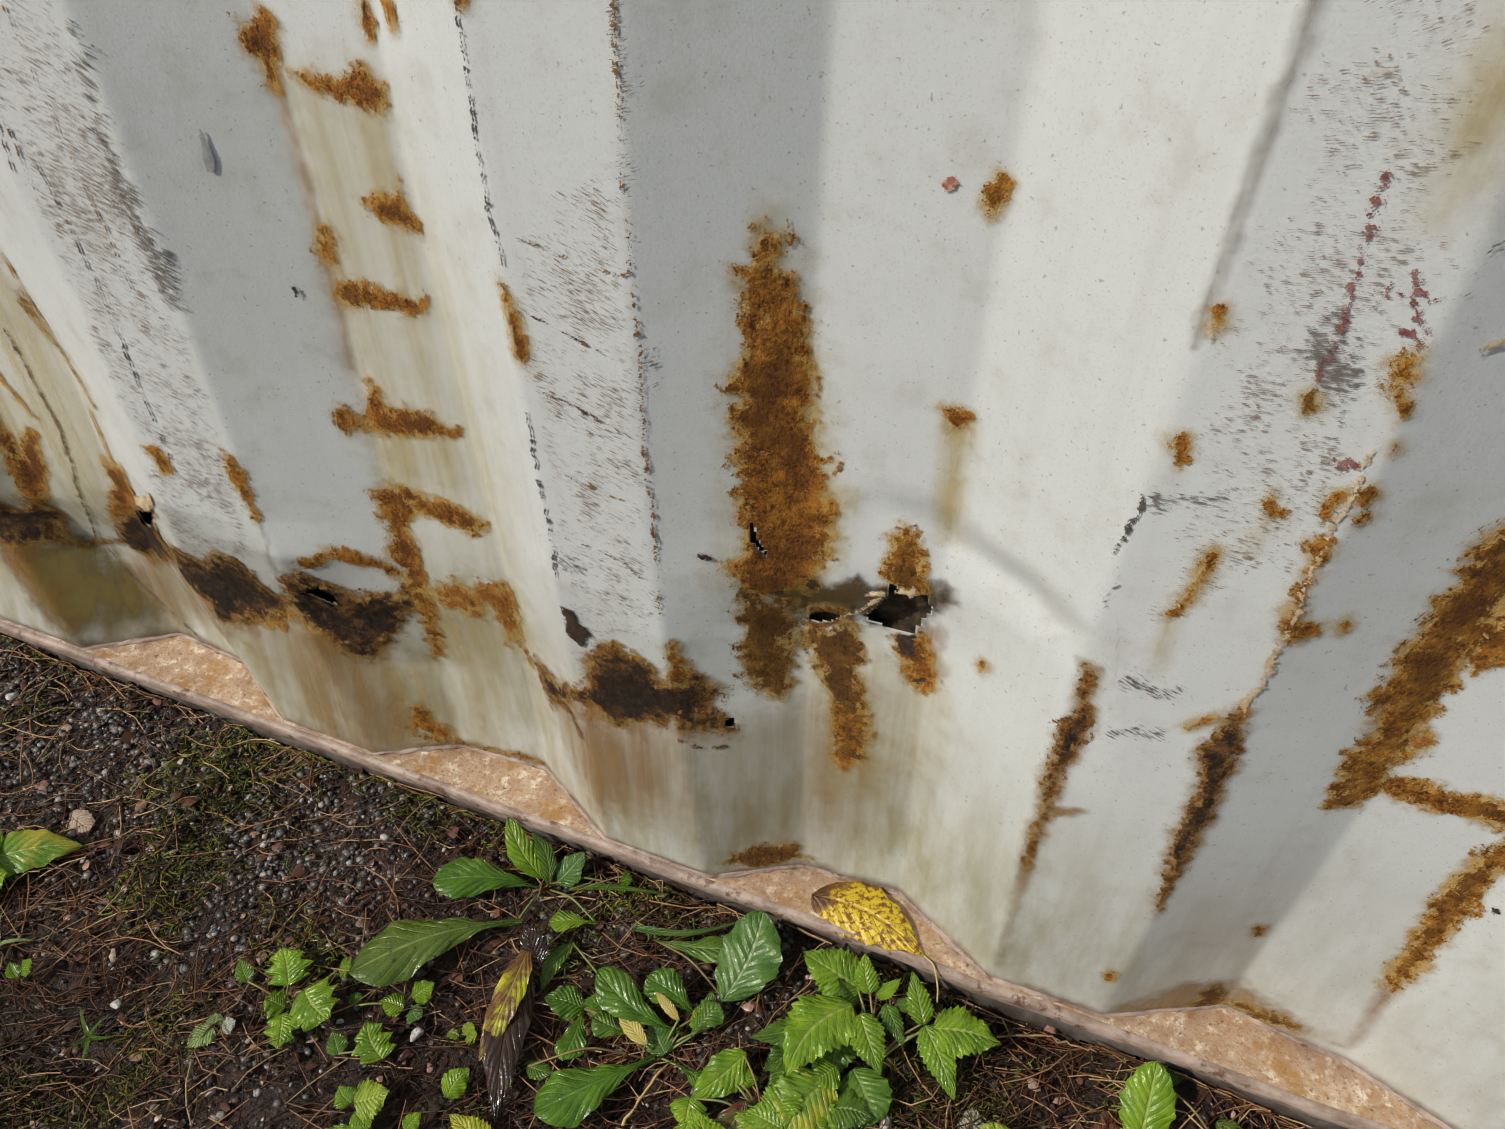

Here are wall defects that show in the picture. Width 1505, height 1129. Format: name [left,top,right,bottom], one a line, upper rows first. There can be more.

rust [226,5,390,116]
rust [357,0,398,42]
rust [361,174,424,239]
rust [1299,388,1322,415]
rust [1376,347,1429,419]
rust [0,216,878,806]
rust [877,520,933,596]
rust [940,406,976,526]
rust [885,627,943,695]
rust [1156,444,1398,912]
rust [1020,662,1098,872]
rust [1317,519,1505,1004]